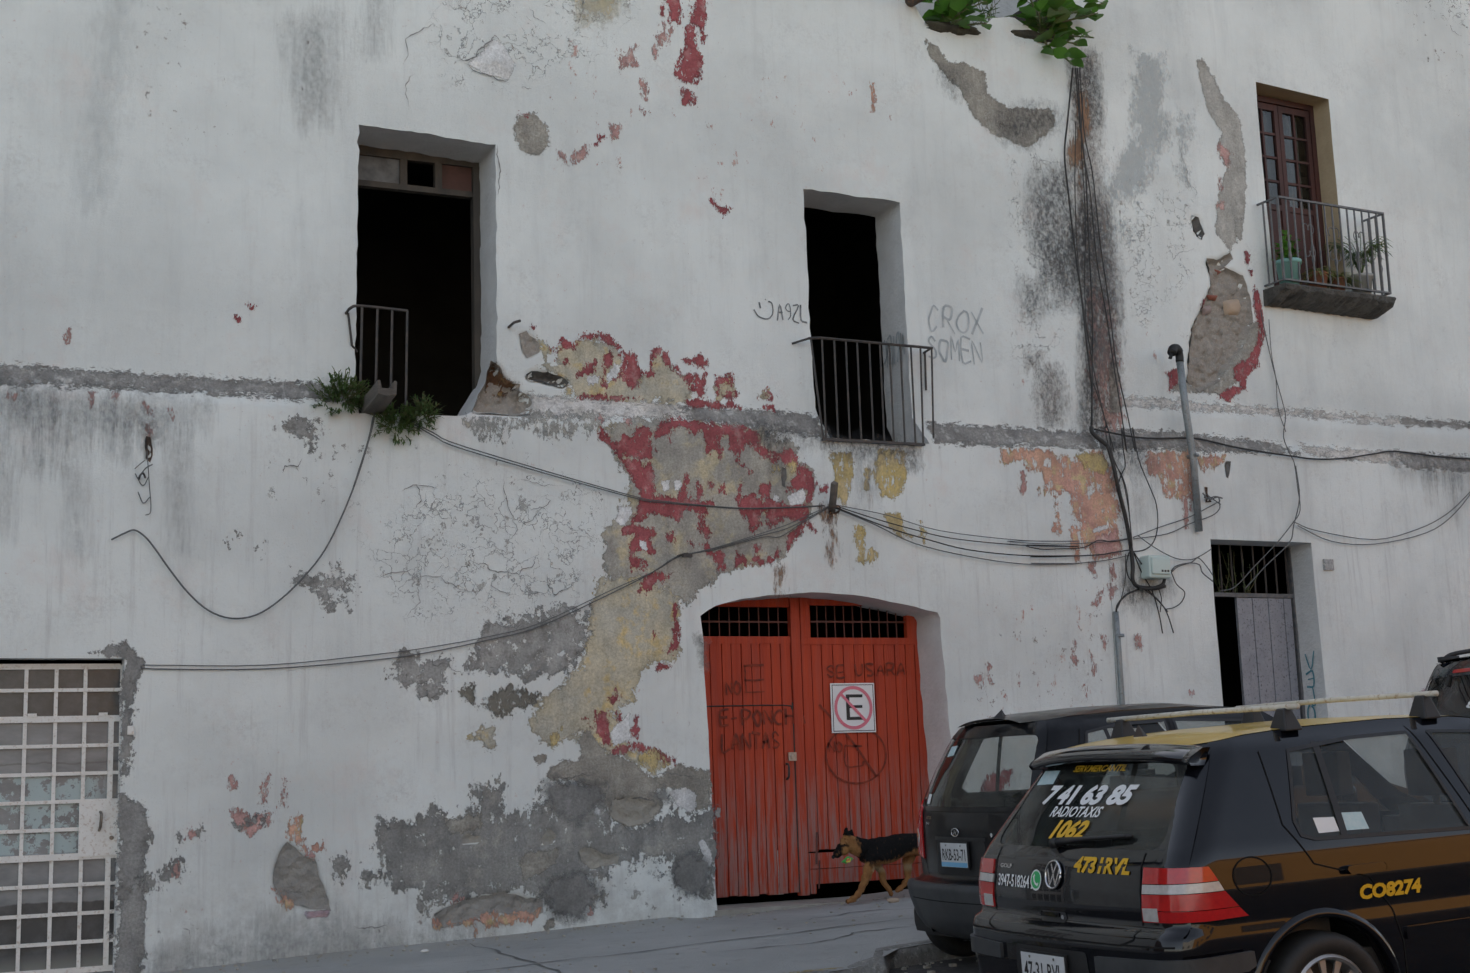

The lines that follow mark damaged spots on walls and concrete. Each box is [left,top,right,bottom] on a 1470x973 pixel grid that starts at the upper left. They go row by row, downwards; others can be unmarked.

peeling [615,0,709,116]
flaking render [924,39,1055,147]
leakage [1027,53,1188,427]
flaking render [1119,59,1267,402]
peeling [227,324,928,937]
peeling [981,769,1013,792]
peeling [974,279,1129,718]
peeling [1143,449,1231,529]